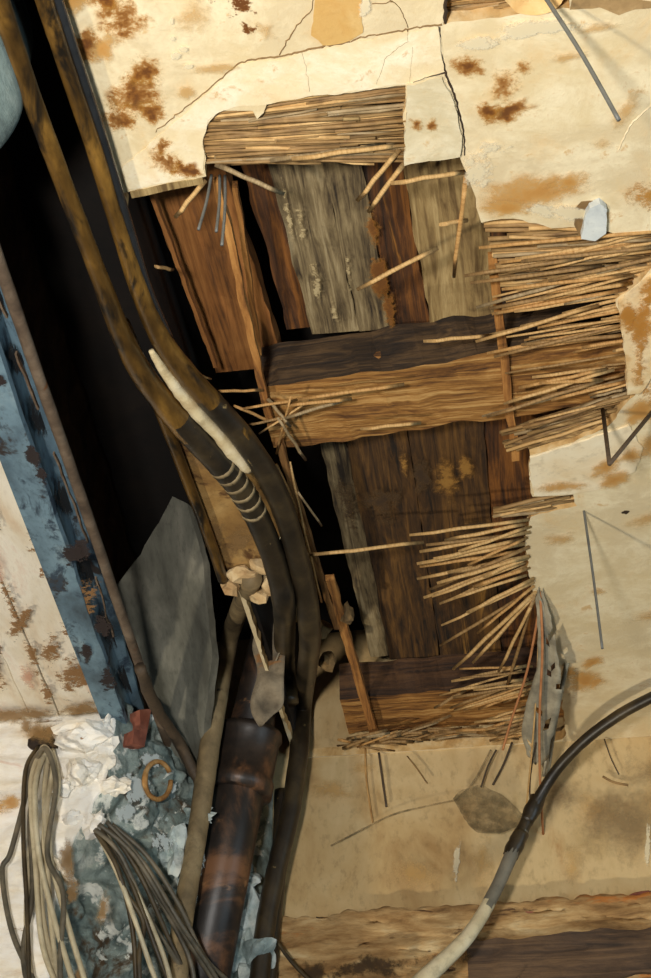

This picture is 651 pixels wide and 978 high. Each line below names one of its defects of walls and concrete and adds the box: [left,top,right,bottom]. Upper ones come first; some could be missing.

rust [76,0,147,61]
rust [102,59,163,129]
rust [230,0,257,34]
crack [156,0,466,156]
rust [451,56,483,75]
rust [477,76,526,123]
spalling [570,0,651,15]
peeling [618,275,651,395]
peeling [529,424,643,496]
spalling [27,713,132,798]
spalling [277,904,480,978]
spalling [475,890,651,941]